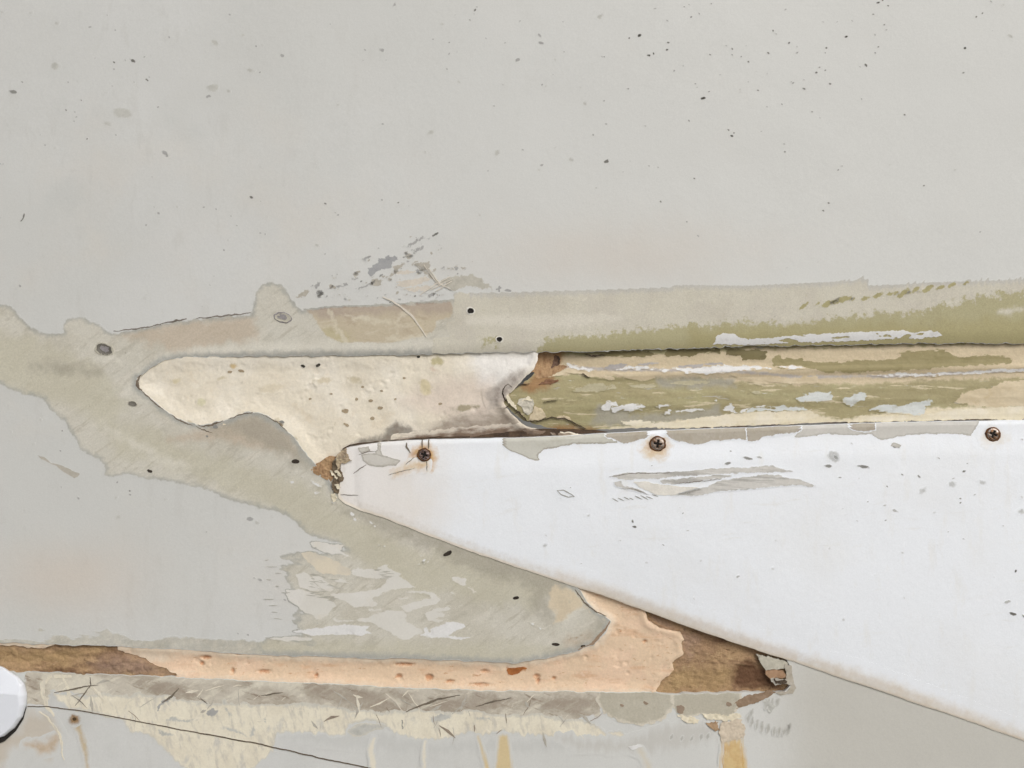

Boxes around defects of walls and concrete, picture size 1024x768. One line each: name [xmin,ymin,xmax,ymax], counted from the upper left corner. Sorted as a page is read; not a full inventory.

corrosion [388,440,440,480]
corrosion [636,433,675,464]
corrosion [975,424,1013,451]
peeling [0,232,1024,768]